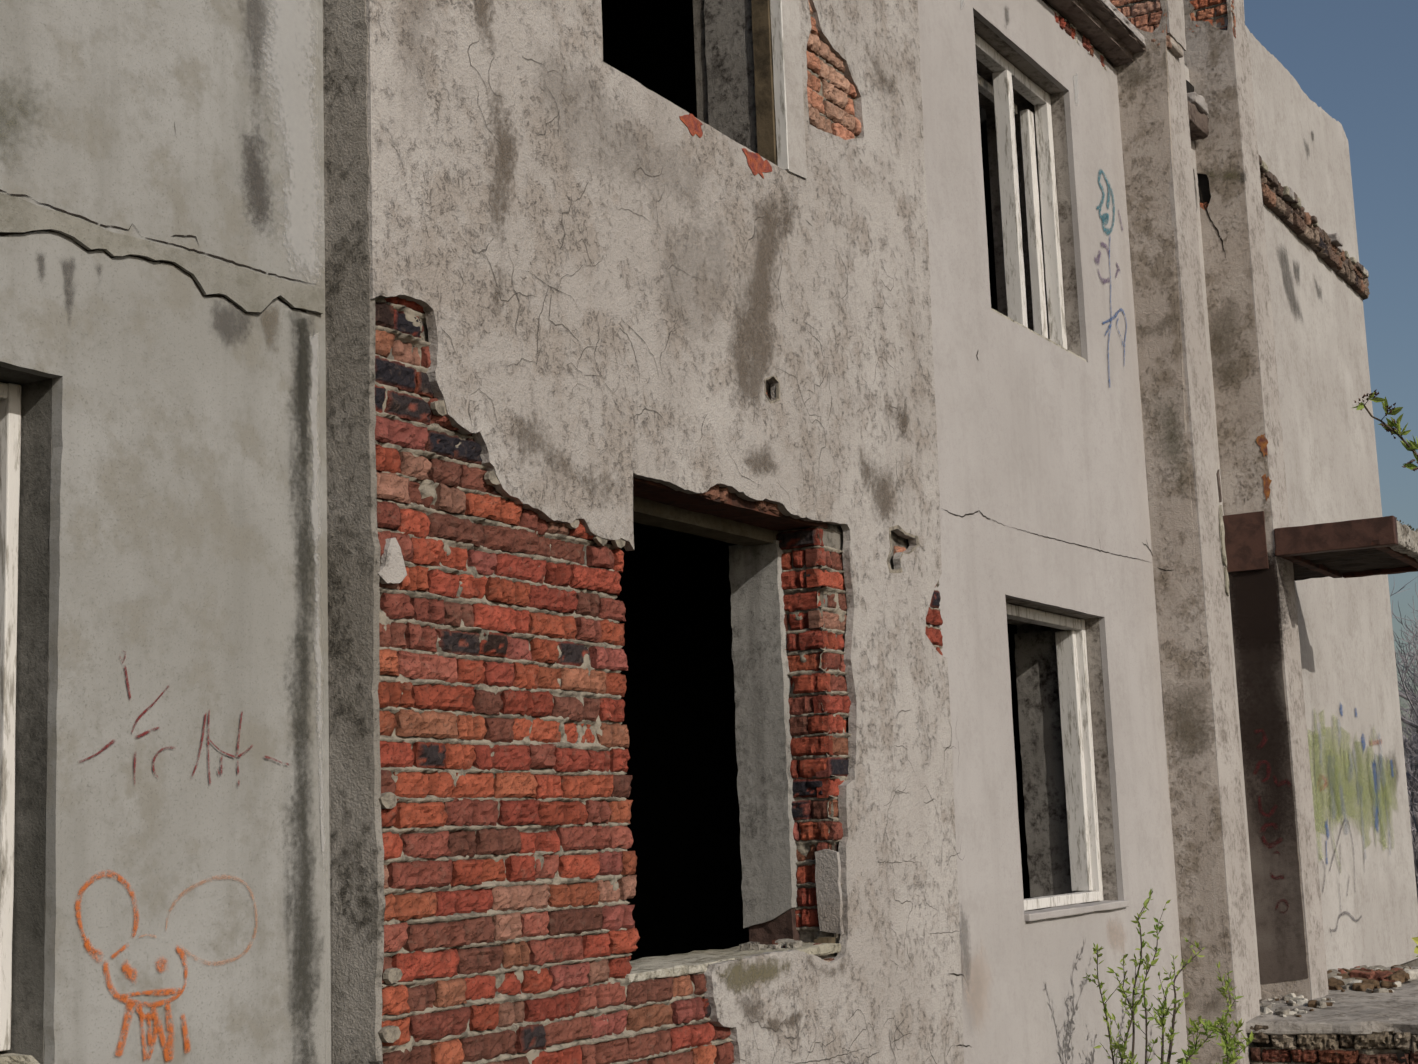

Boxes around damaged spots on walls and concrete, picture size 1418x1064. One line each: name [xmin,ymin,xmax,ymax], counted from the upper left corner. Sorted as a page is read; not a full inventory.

water stain [263,0,320,275]
water stain [490,94,517,222]
spalling [807,0,862,140]
spalling [1110,0,1172,50]
crack [0,189,321,286]
crack [460,167,676,425]
water stain [733,194,796,399]
crack [946,508,1172,571]
water stain [263,310,325,1064]
spalling [375,297,734,1064]
spalling [925,580,943,655]
crack [736,985,971,1064]